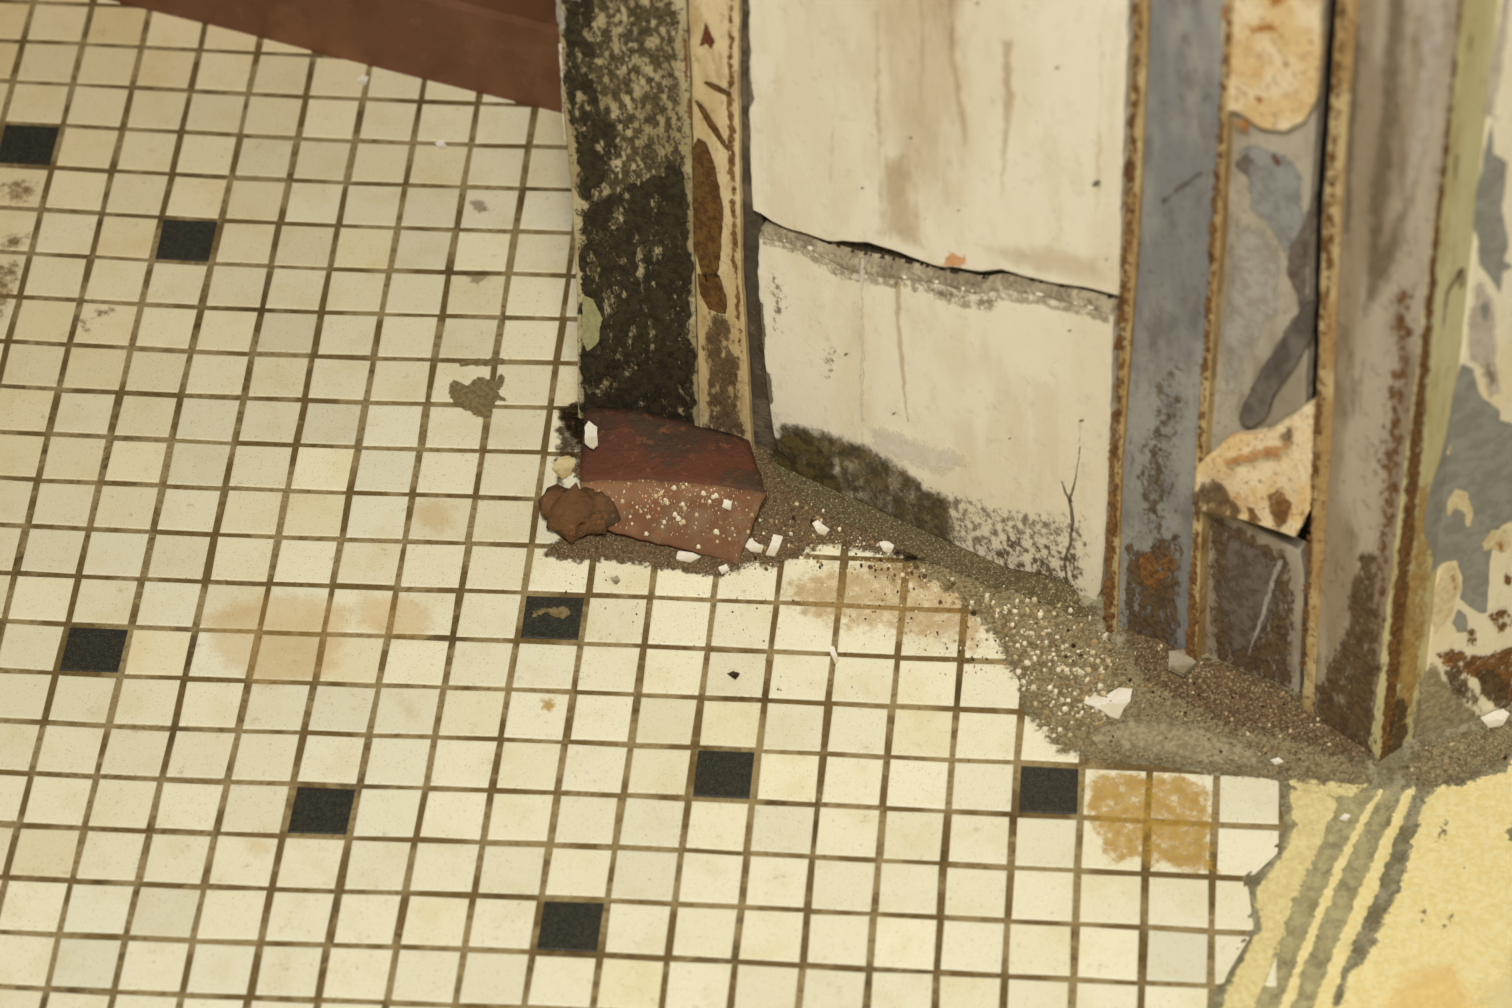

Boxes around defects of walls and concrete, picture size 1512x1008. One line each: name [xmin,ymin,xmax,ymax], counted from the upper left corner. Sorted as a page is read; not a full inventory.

peeling [584,421,598,449]
mould [562,0,697,425]
peeling [676,551,701,563]
peeling [745,534,783,556]
leakage [771,258,1093,591]
crack [758,219,1118,316]
corrosion [1102,0,1463,761]
peeling [1236,0,1335,399]
spalling [1297,508,1312,556]
peeling [1412,0,1512,740]
leakage [1081,773,1213,870]
peeling [1222,759,1512,1008]